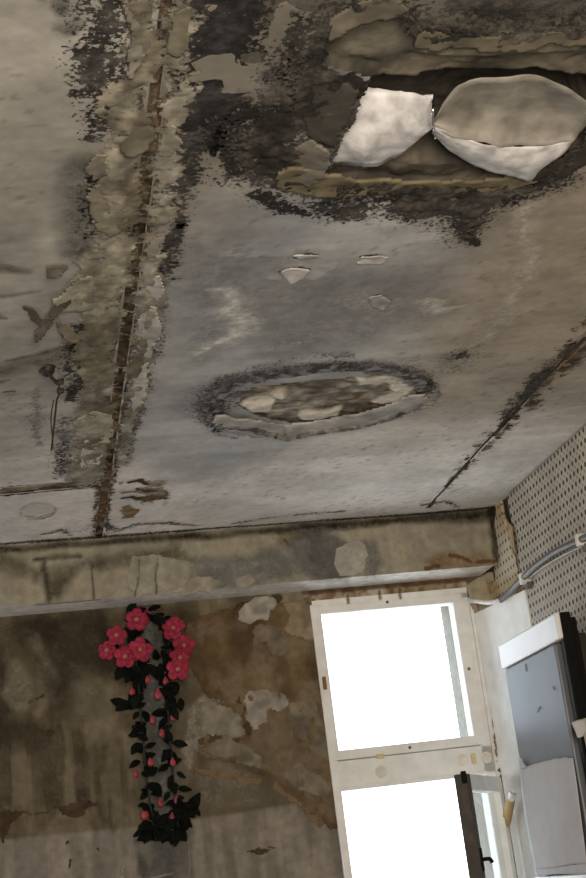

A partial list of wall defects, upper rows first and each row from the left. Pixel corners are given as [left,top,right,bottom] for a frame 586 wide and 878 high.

leakage [53,0,131,143]
flaking render [270,0,586,200]
leakage [0,320,93,405]
crack [0,0,188,539]
peeling [278,253,319,284]
leakage [154,0,586,439]
crack [430,316,586,507]
peeling [126,554,225,598]
leakage [0,500,497,601]
peeling [334,541,368,576]
leakage [0,611,193,878]
flaking render [181,594,338,831]